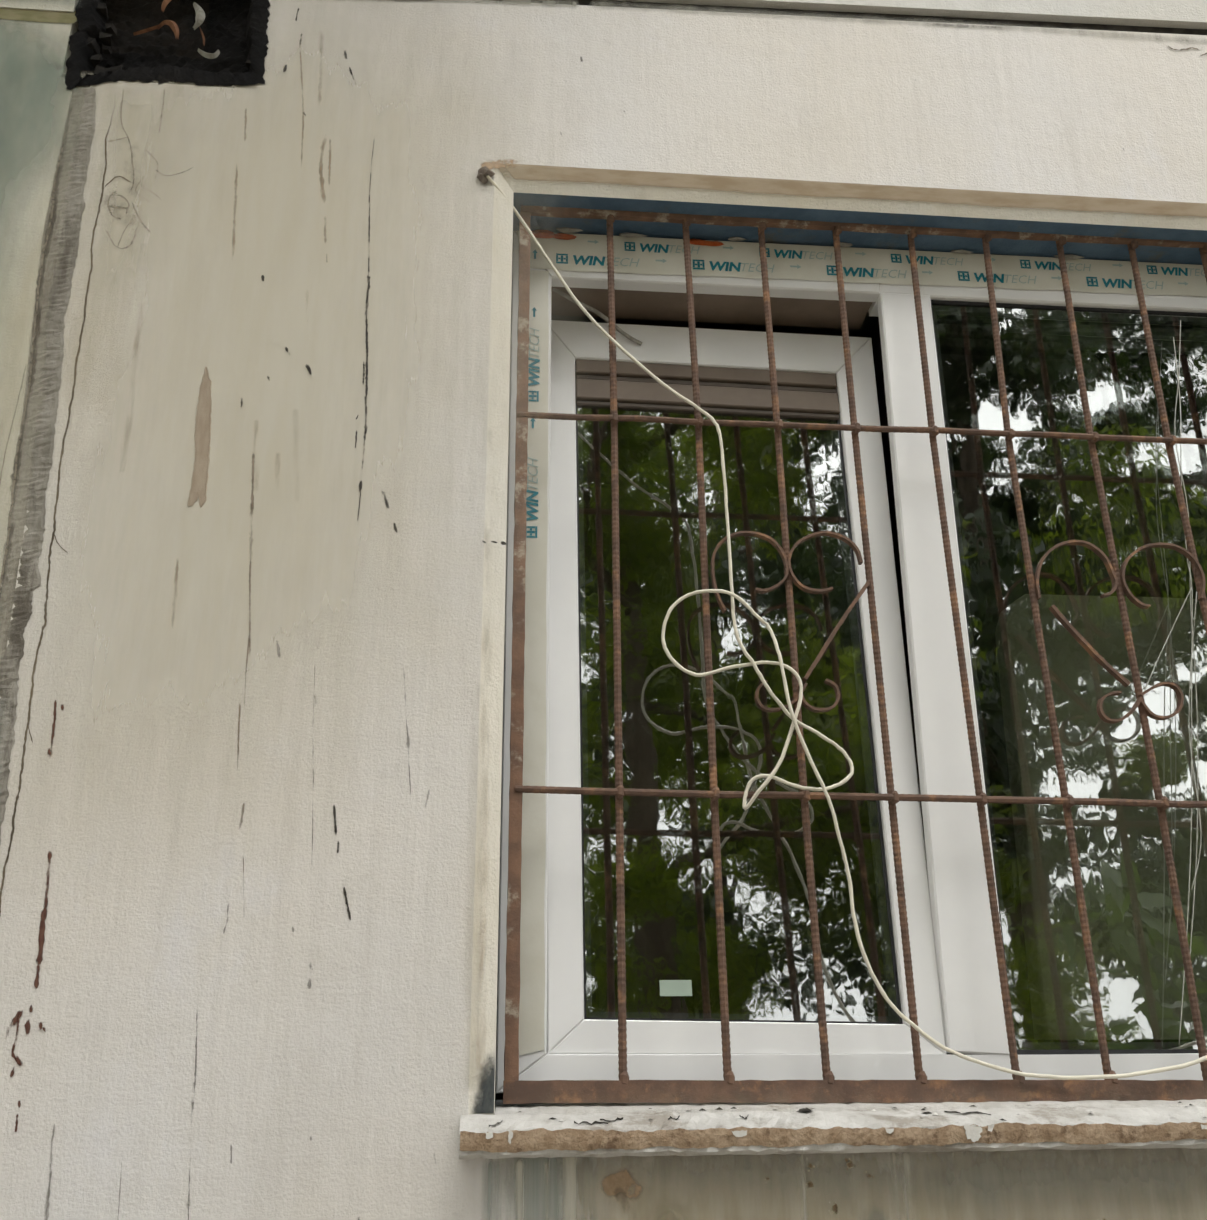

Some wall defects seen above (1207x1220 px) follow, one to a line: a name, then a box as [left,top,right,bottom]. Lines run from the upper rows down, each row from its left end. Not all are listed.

crack [0,89,191,916]
water stain [34,851,52,989]
spalling [460,1122,1207,1178]
water stain [516,1151,1207,1220]